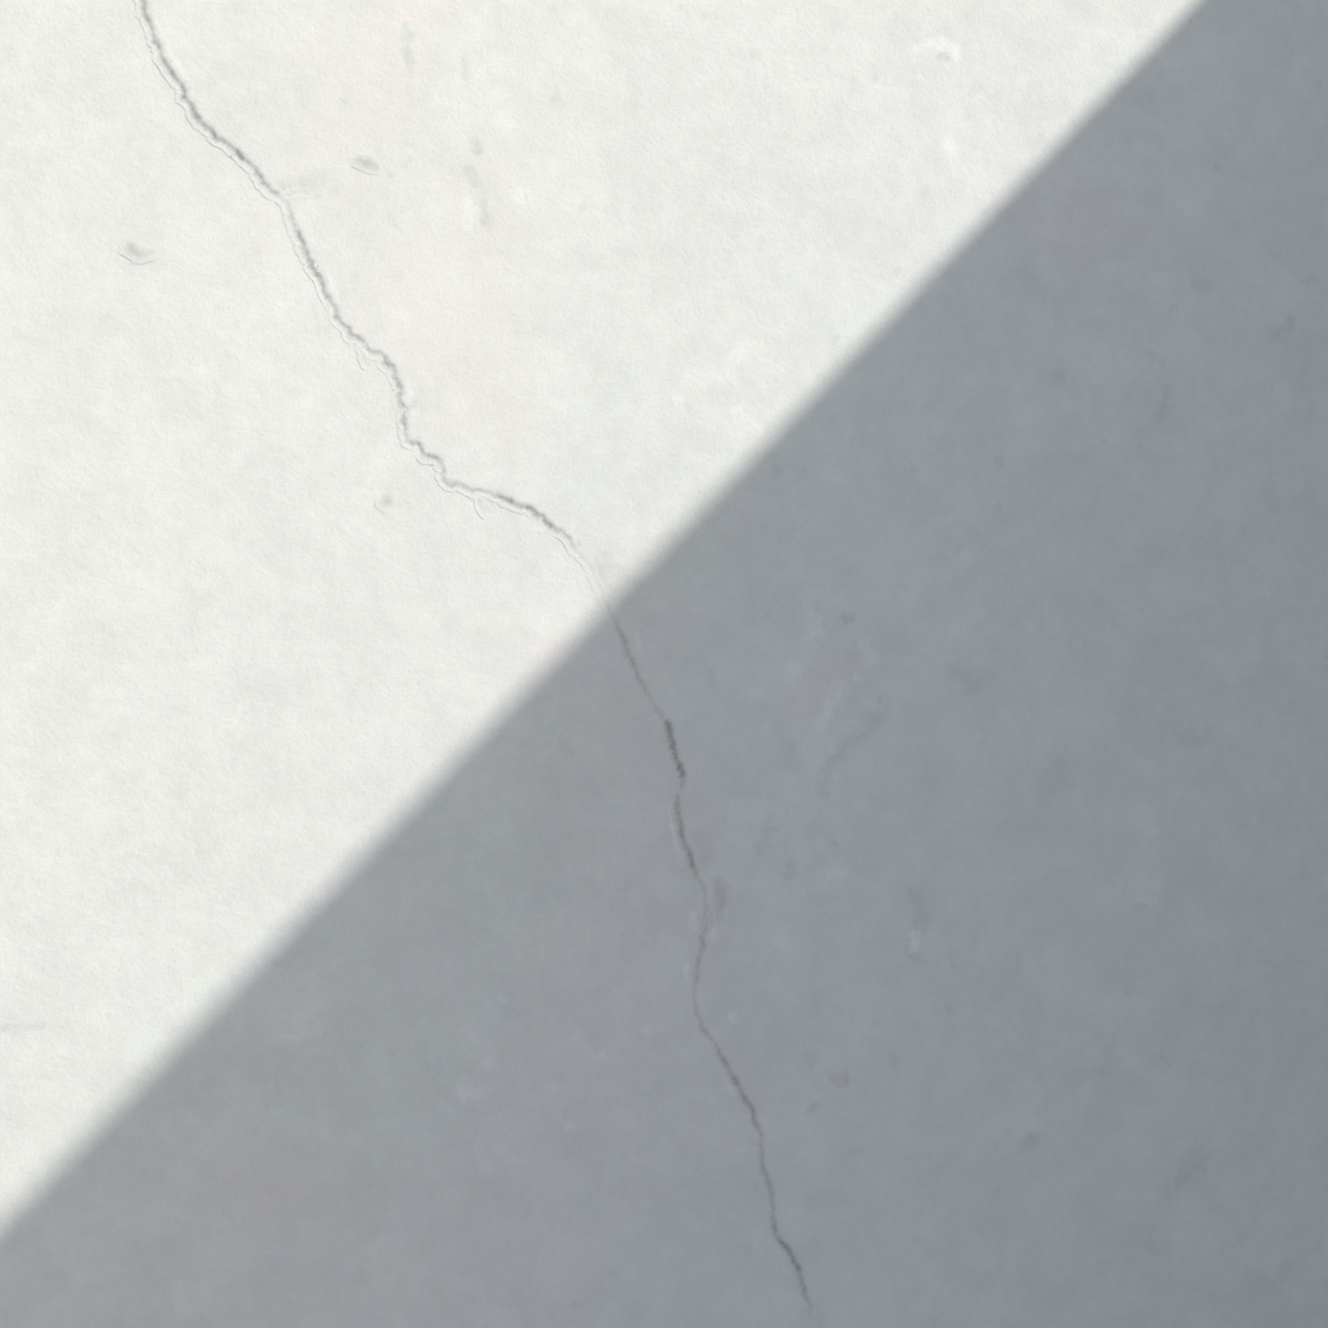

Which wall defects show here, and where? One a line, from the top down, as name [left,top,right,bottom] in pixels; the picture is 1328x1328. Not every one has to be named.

crack [134,0,817,1319]